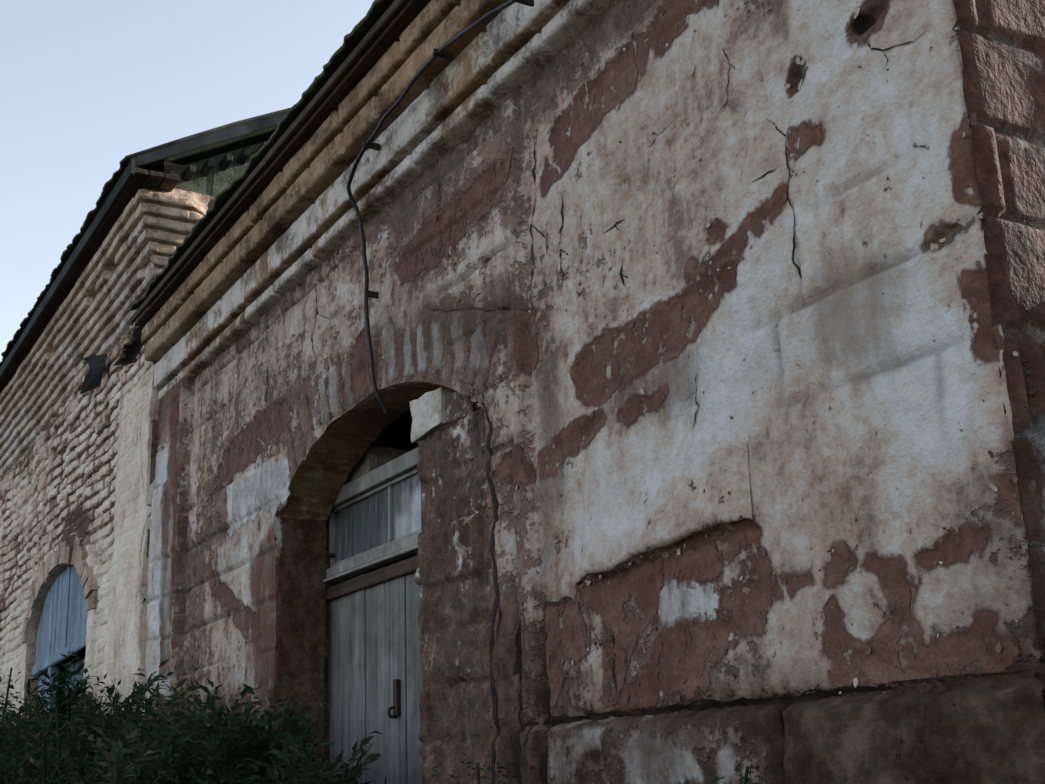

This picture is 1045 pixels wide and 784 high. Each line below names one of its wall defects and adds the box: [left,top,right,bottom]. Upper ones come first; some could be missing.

peeling [539,0,718,197]
spalling [784,55,806,98]
spalling [845,0,889,48]
crack [864,30,927,67]
crack [427,129,568,313]
crack [752,119,802,280]
peeling [921,112,982,252]
peeling [490,182,788,490]
crack [688,374,699,428]
peeling [957,265,1001,363]
crack [482,394,1030,784]
peeling [545,516,1019,714]